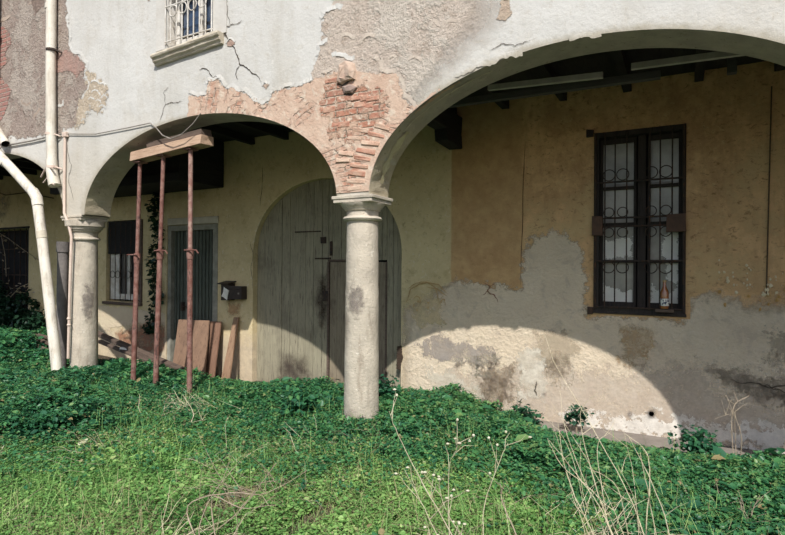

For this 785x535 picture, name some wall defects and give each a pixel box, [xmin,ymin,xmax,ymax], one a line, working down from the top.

flaking render [0,0,46,148]
flaking render [56,0,109,134]
crack [200,6,260,79]
flaking render [187,0,523,193]
spalling [569,32,602,41]
peeling [396,229,785,448]
water stain [411,298,785,454]
crack [731,379,785,393]